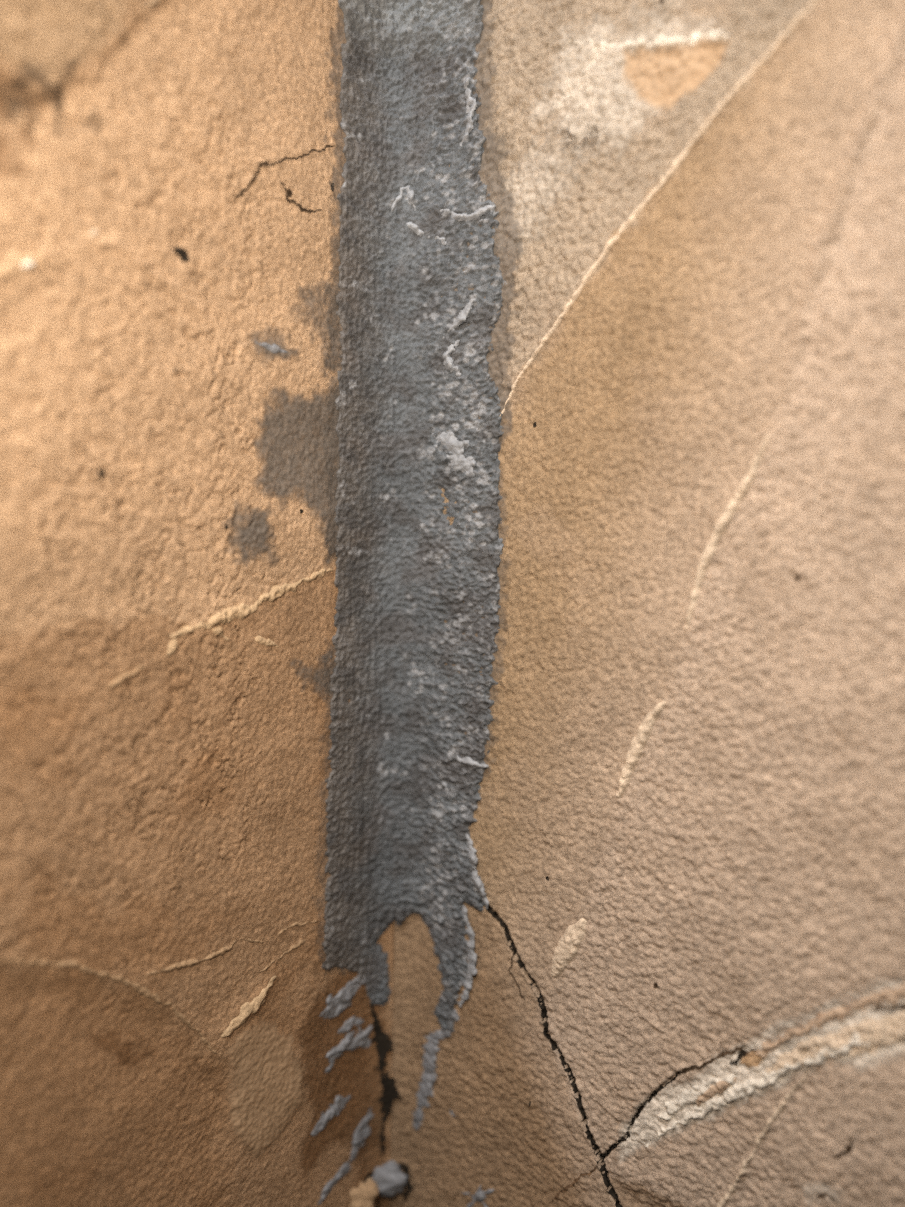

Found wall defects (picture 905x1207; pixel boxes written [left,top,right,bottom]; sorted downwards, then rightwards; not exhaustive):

crack [366,1002,414,1204]
crack [481,900,679,1207]
flaking render [620,978,905,1160]